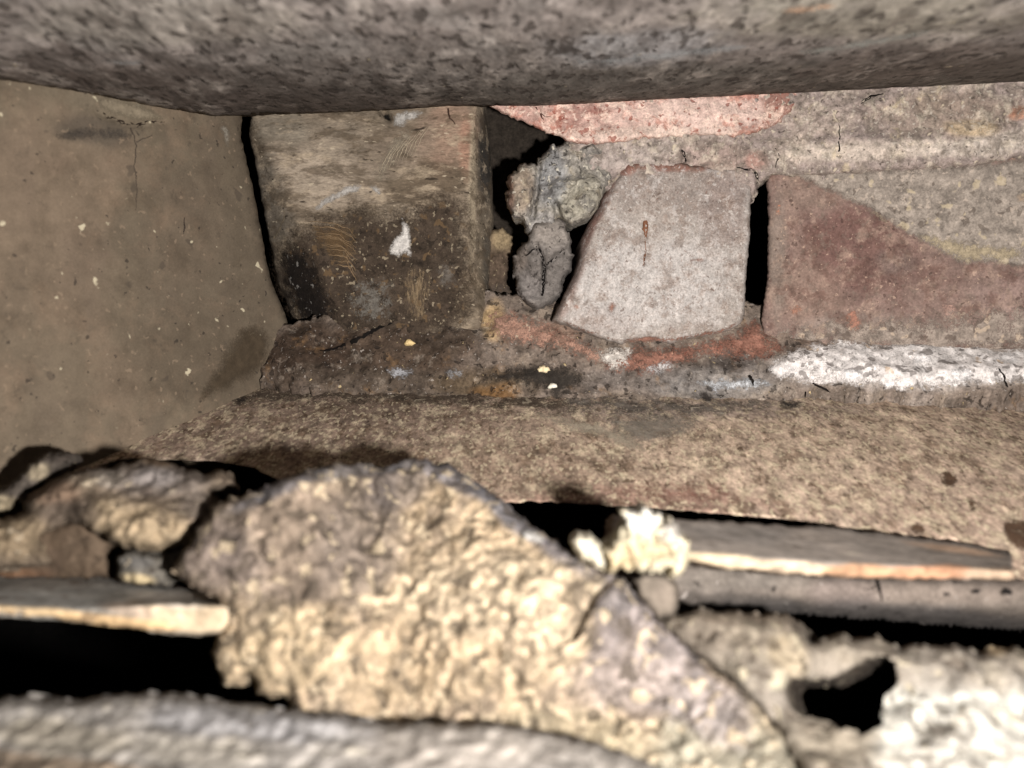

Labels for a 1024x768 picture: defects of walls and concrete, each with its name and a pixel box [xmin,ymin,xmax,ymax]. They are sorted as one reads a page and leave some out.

crack [130,128,152,207]
crack [522,246,562,296]